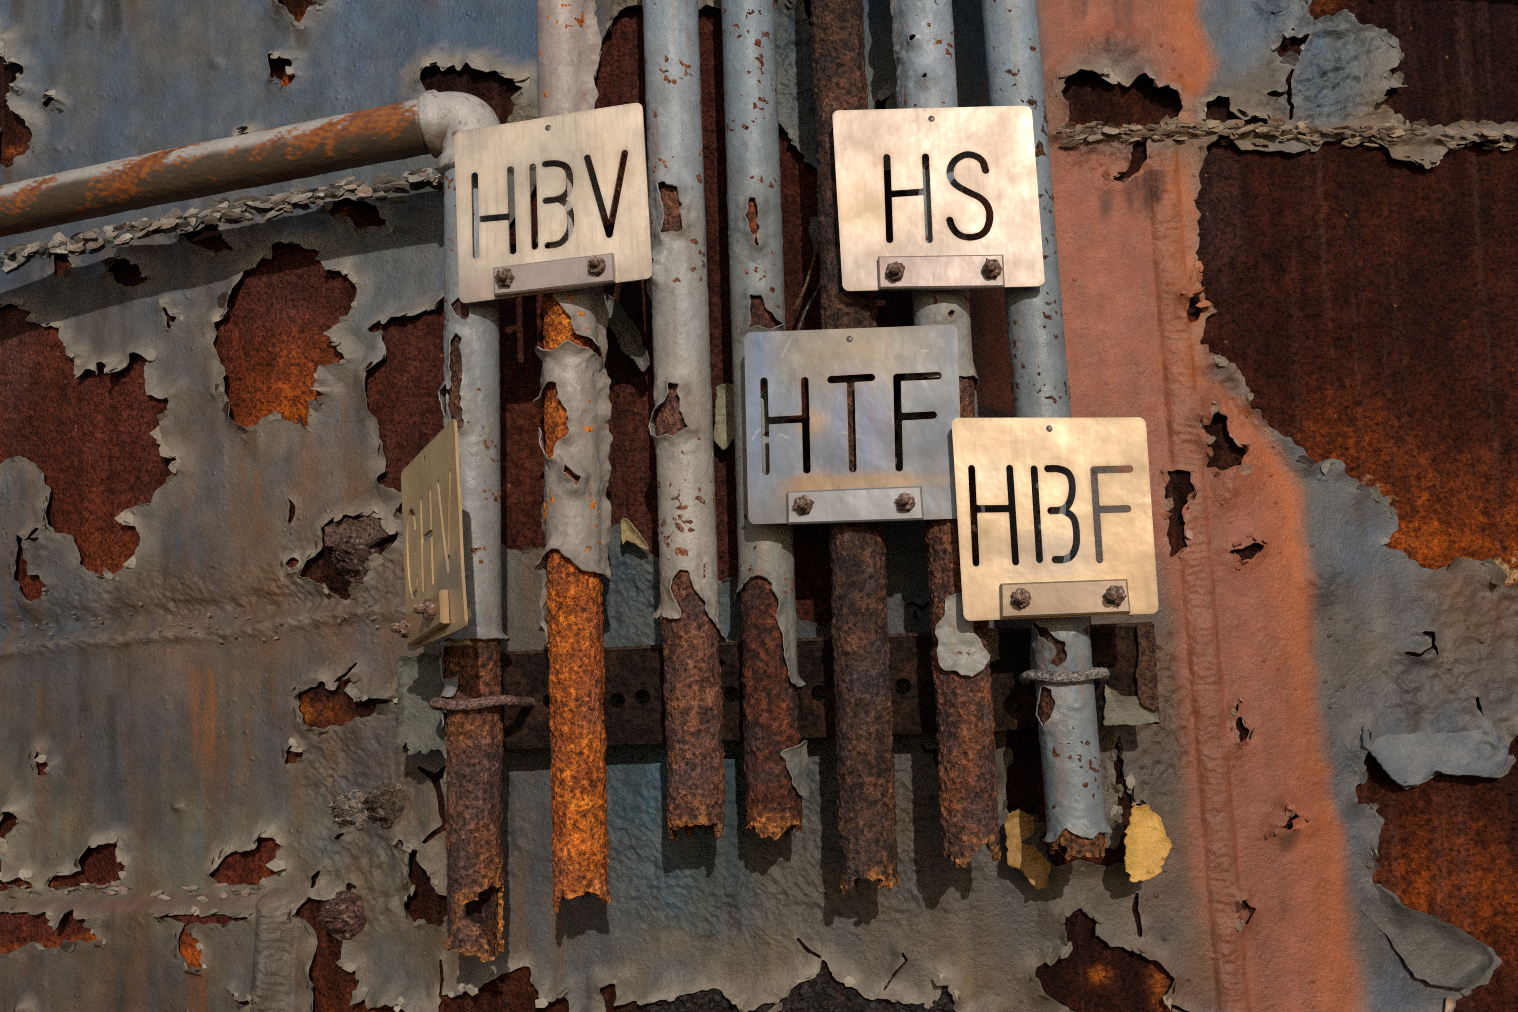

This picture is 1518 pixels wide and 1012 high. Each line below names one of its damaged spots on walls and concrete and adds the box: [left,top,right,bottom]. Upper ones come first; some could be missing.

peeling [0,0,832,785]
peeling [0,616,1198,1012]
peeling [883,521,899,572]
corrosion [1135,623,1159,711]
peeling [1219,689,1272,765]
peeling [1224,879,1270,938]
peeling [981,0,1518,612]
peeling [1257,699,1518,1012]